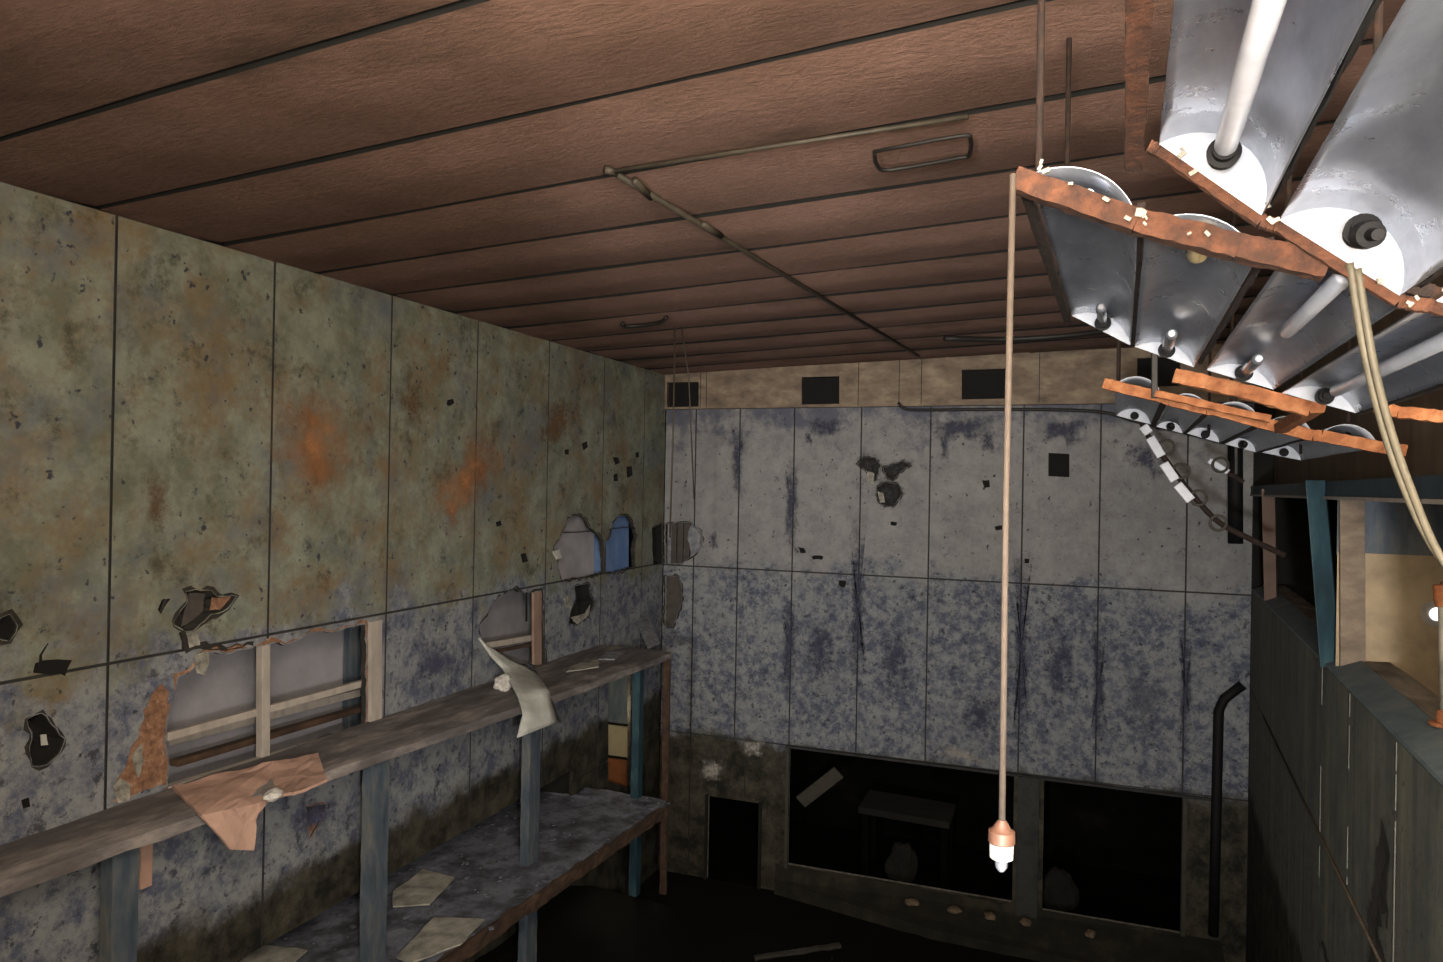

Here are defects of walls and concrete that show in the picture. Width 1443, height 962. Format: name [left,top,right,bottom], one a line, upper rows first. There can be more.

damp [733,436,744,489]
damp [786,473,797,543]
spalling [856,454,912,526]
spalling [23,709,66,771]
peeling [113,586,368,803]
spalling [479,586,547,667]
spalling [552,513,704,628]
damp [784,610,836,682]
damp [852,546,864,660]
damp [1015,568,1029,710]
damp [1092,632,1105,734]
damp [1180,644,1192,738]